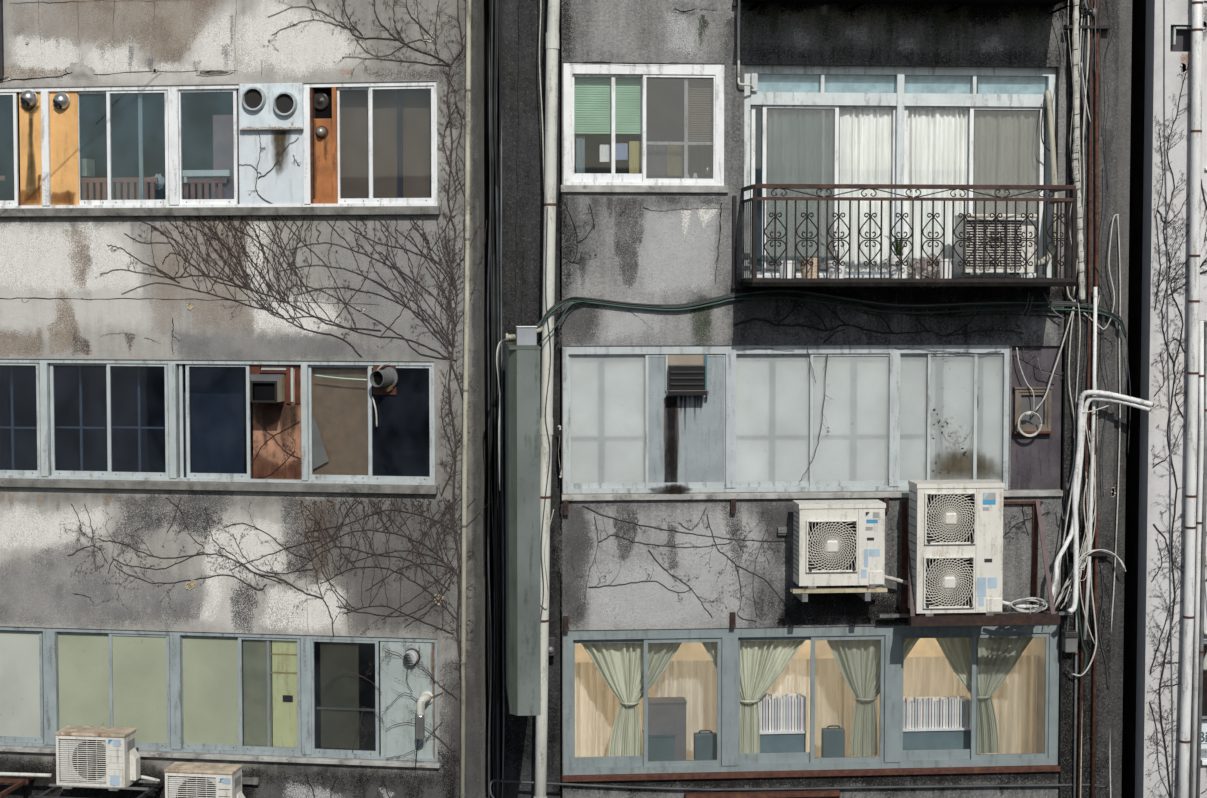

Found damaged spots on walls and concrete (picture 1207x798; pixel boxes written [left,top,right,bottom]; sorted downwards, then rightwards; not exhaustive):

leakage [3,0,234,83]
leakage [0,112,101,358]
leakage [560,196,645,288]
leakage [130,0,482,636]
leakage [664,394,707,493]
leakage [0,490,234,630]